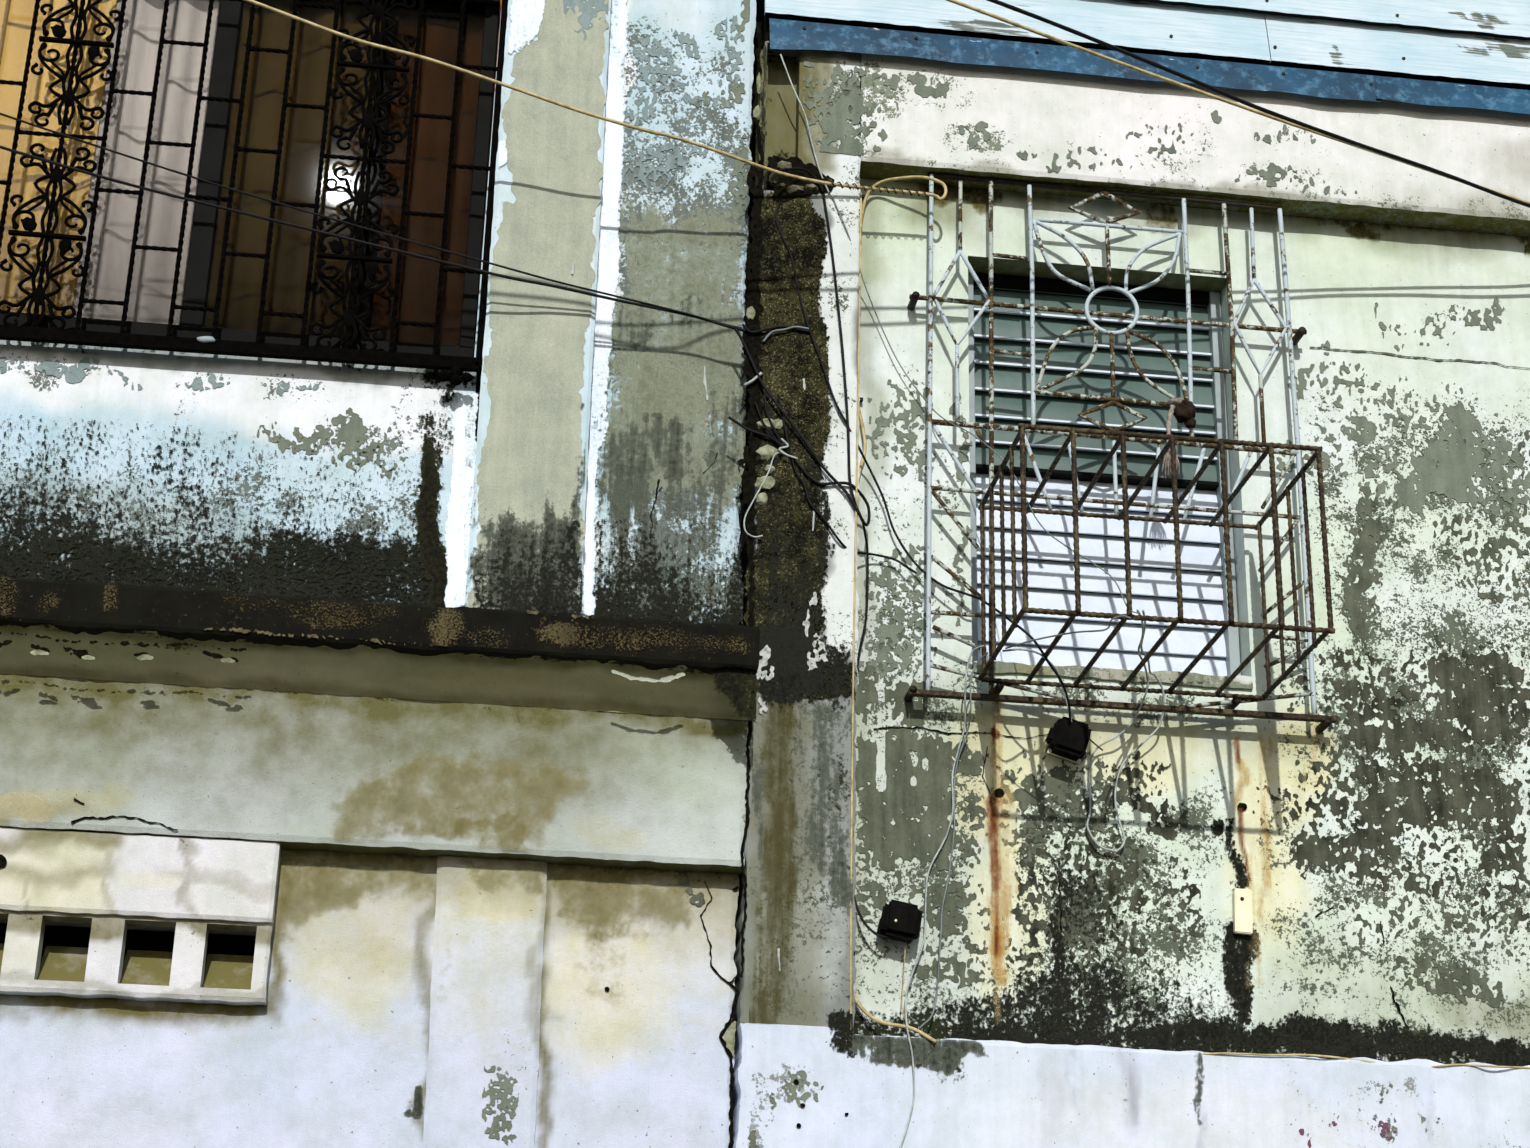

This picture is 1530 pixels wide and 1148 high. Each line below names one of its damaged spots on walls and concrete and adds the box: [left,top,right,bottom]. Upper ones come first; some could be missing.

damp [0,369,478,608]
peeling [254,407,405,485]
peeling [468,0,761,609]
crack [650,479,663,540]
damp [464,184,853,1024]
crack [700,691,755,1148]
crack [703,22,764,626]
corrosion [990,728,1000,767]
corrosion [987,791,1011,984]
damp [826,842,1530,1125]
corrosion [1235,738,1270,885]
peeling [1237,340,1530,1008]